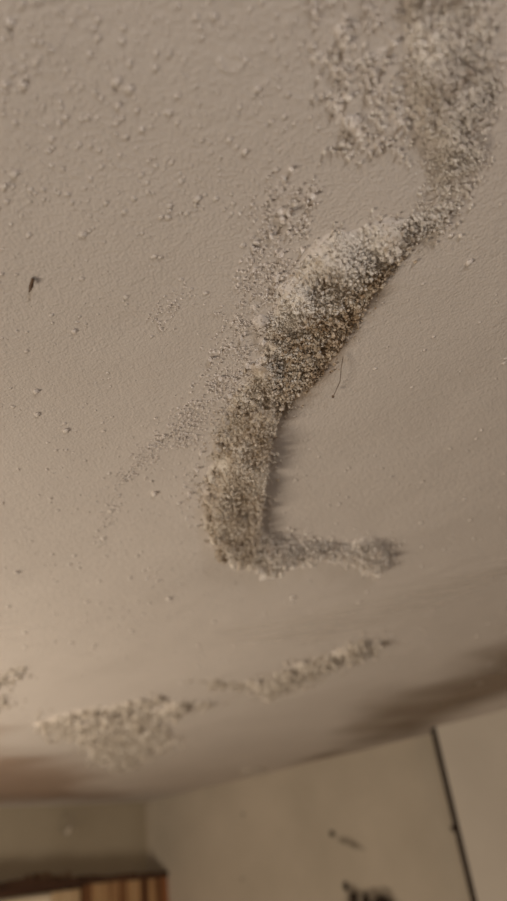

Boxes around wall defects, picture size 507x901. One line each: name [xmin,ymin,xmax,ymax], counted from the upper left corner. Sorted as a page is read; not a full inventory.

leakage [182,0,507,582]
leakage [30,630,408,778]